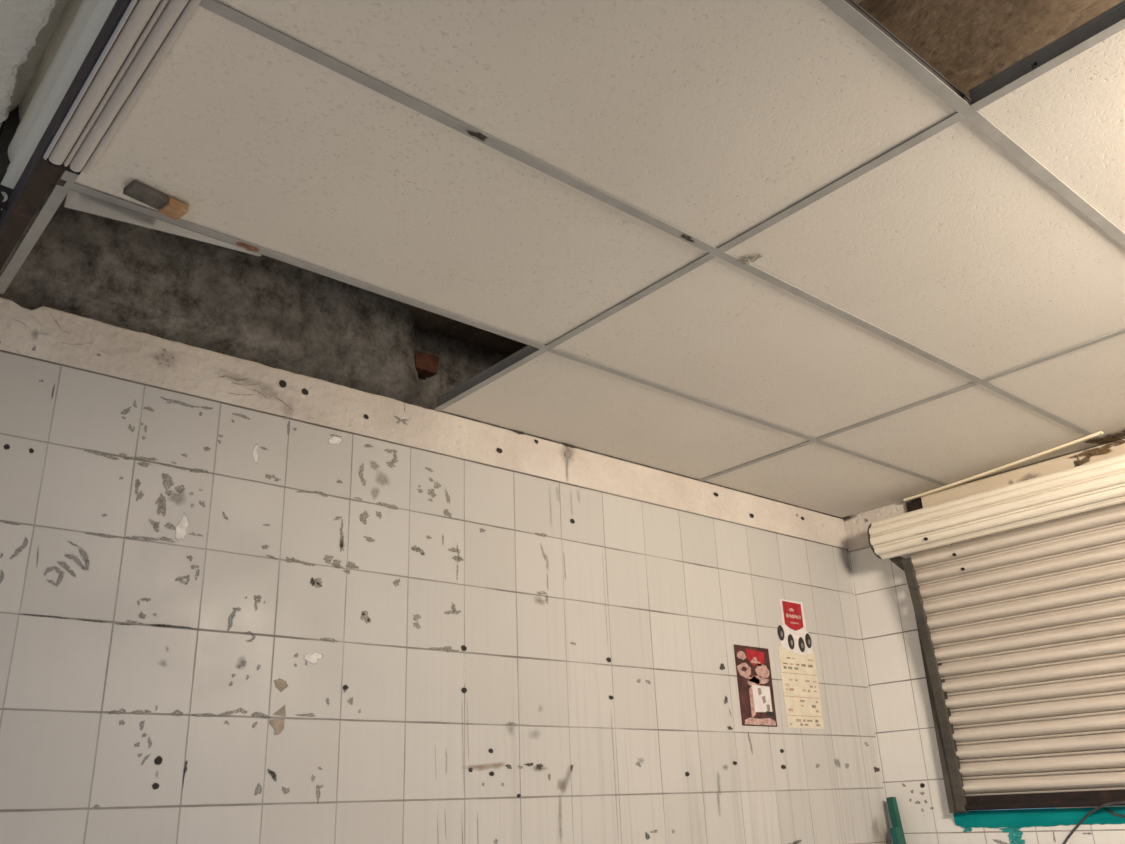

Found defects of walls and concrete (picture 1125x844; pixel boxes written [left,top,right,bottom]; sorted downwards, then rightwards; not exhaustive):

peeling [121,401,154,440]
peeling [359,444,398,497]
peeling [120,454,205,542]
peeling [418,467,451,517]
peeling [37,540,89,586]
peeling [176,555,199,585]
peeling [324,517,359,574]
peeling [360,511,382,542]
peeling [411,535,464,575]
spalling [274,679,288,692]
spalling [270,705,286,735]